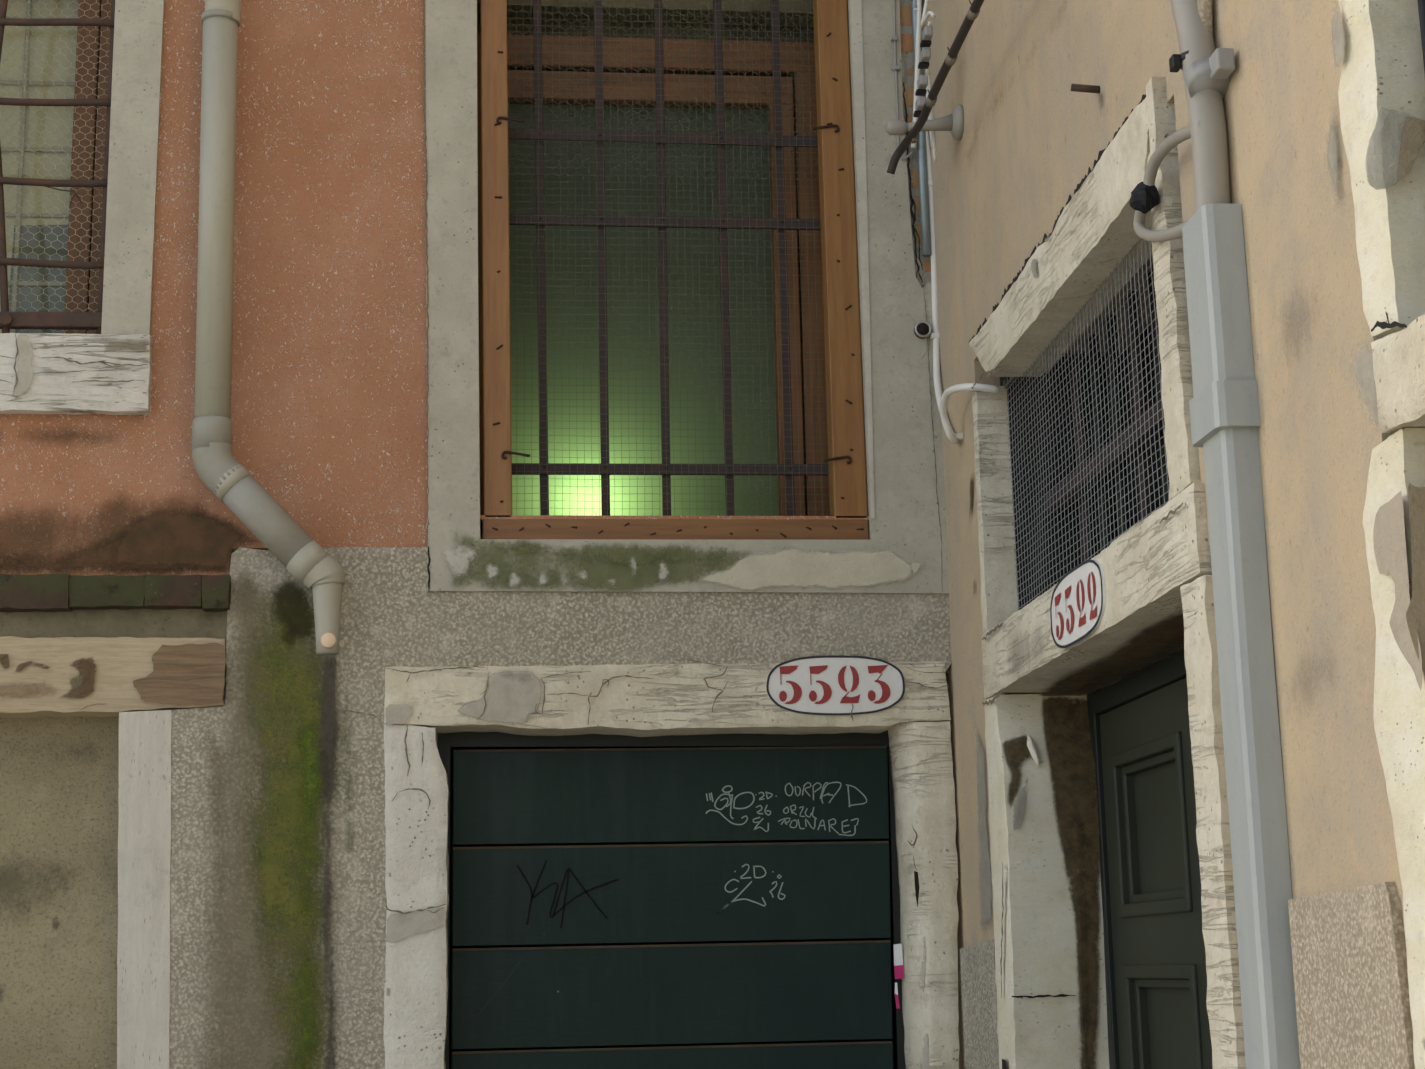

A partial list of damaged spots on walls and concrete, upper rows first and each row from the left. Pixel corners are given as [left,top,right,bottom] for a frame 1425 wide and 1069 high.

water stain [0,502,252,572]
peeling [1373,483,1425,690]
peeling [133,643,226,705]
water stain [206,580,324,1069]
spalling [1003,734,1040,829]